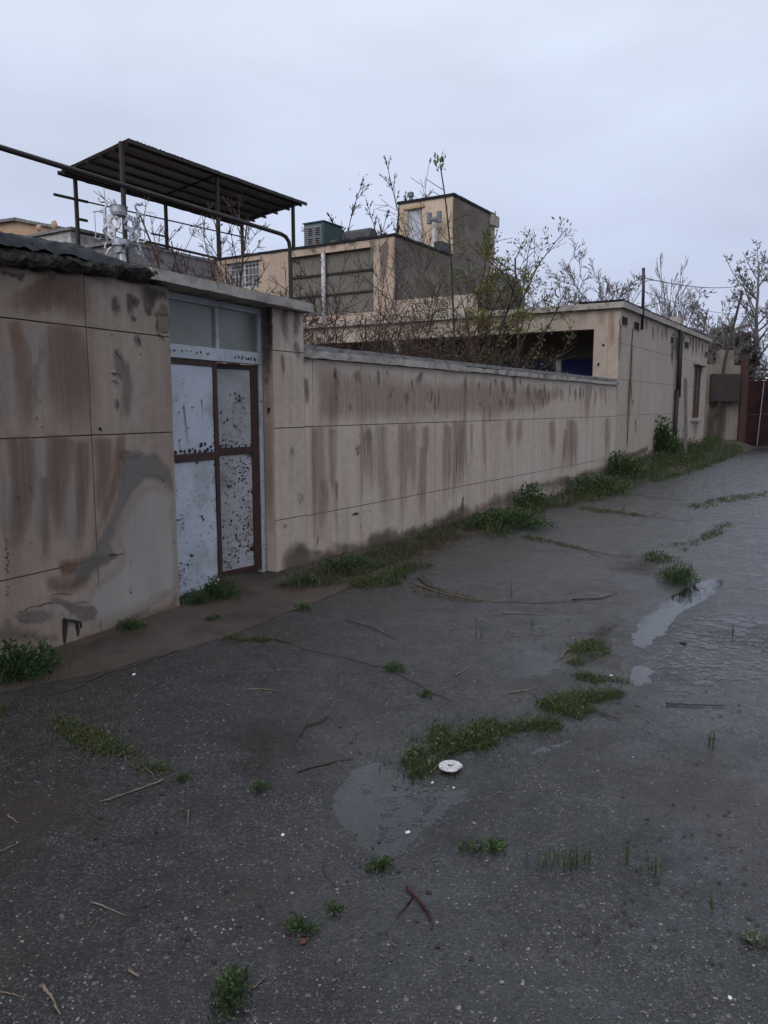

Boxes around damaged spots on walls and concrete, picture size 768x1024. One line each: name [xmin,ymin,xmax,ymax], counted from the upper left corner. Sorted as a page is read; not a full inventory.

leakage [55,440,175,644]